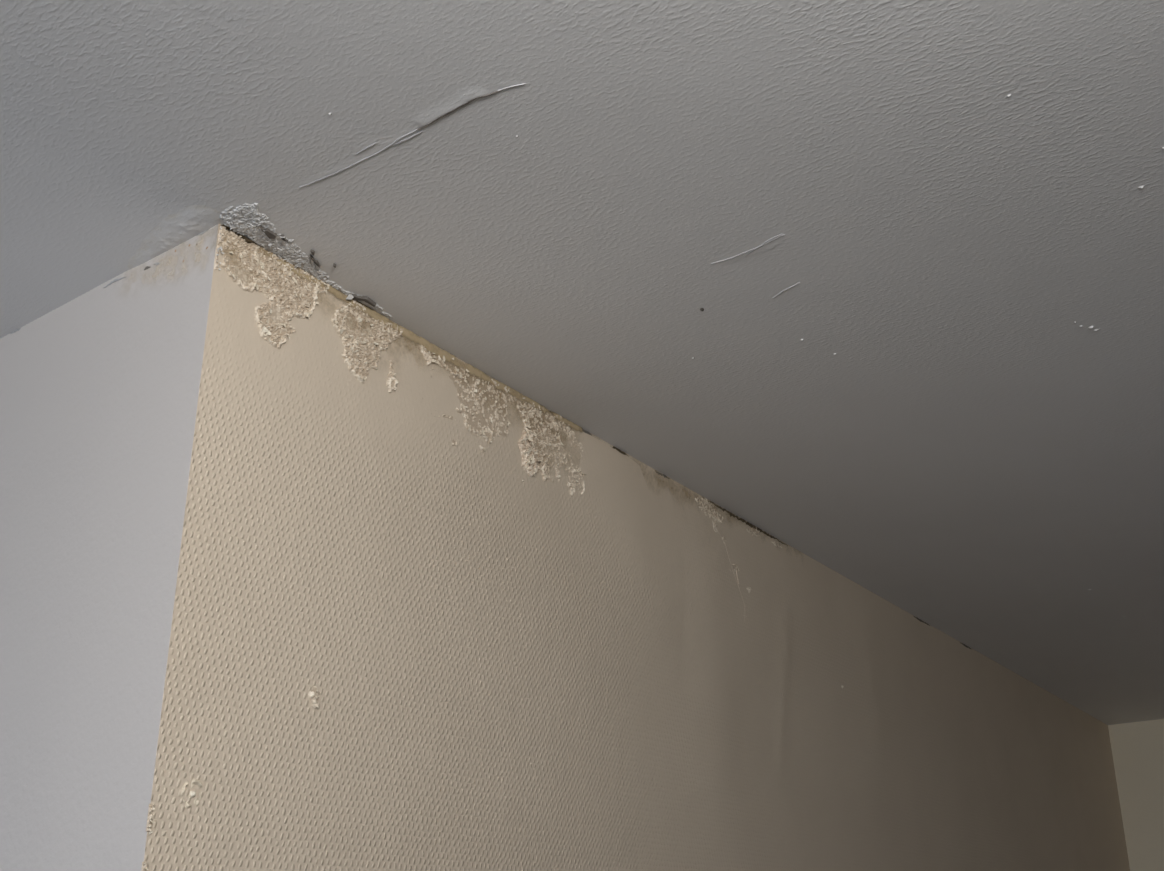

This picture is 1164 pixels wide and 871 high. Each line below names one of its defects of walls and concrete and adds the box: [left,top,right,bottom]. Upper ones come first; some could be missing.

crack [299,79,526,188]
peeling [214,203,403,393]
crack [711,234,786,265]
peeling [418,345,586,497]